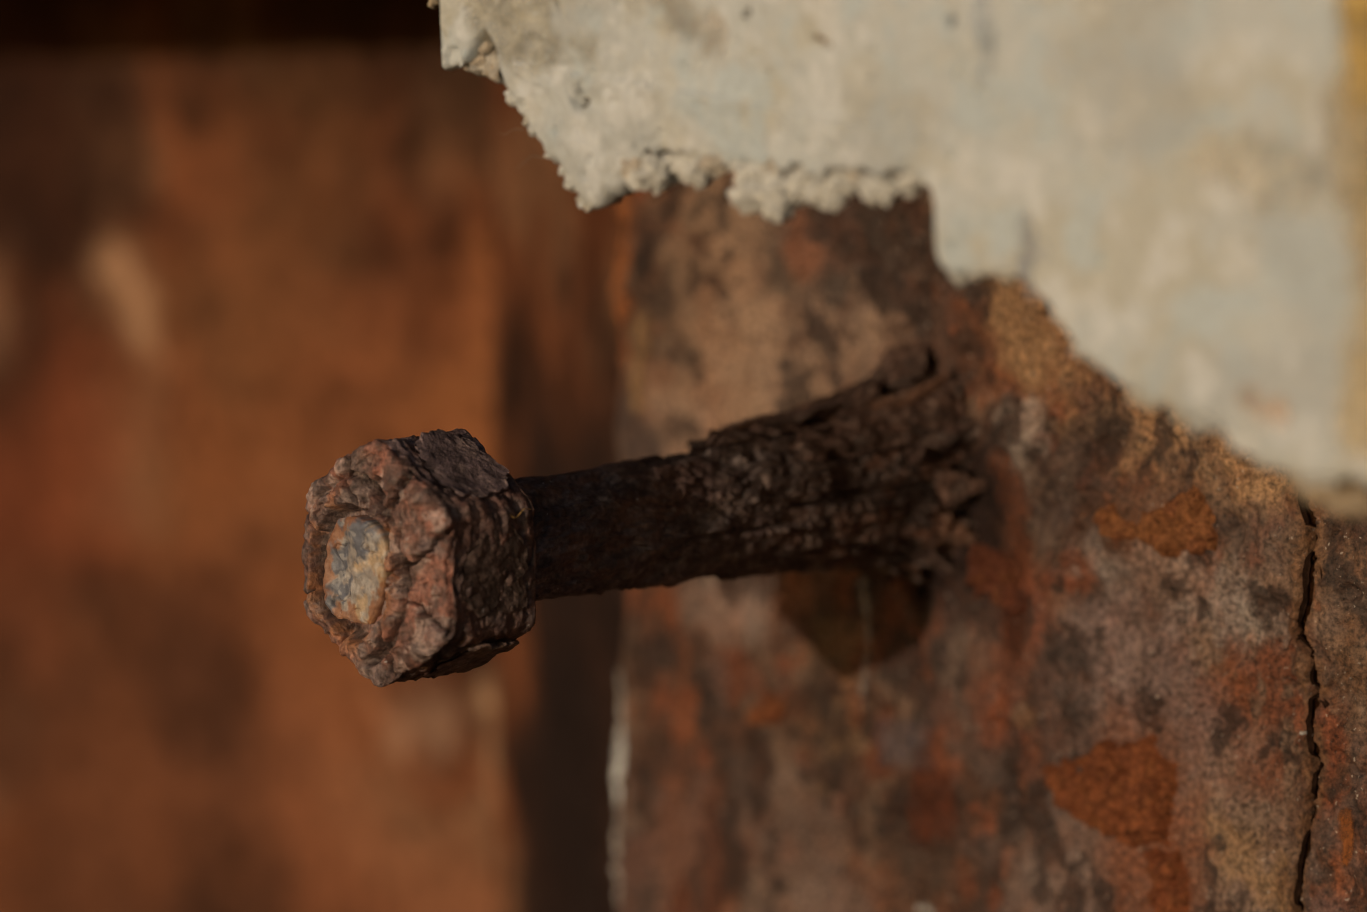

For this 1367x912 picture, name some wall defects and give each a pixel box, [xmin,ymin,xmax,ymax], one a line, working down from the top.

spalling [620,150,926,224]
spalling [948,269,1017,286]
spalling [1128,390,1224,434]
peeling [685,343,988,574]
rust [1081,485,1218,558]
spalling [1285,472,1367,519]
crack [1287,493,1329,911]
rust [1041,734,1191,912]